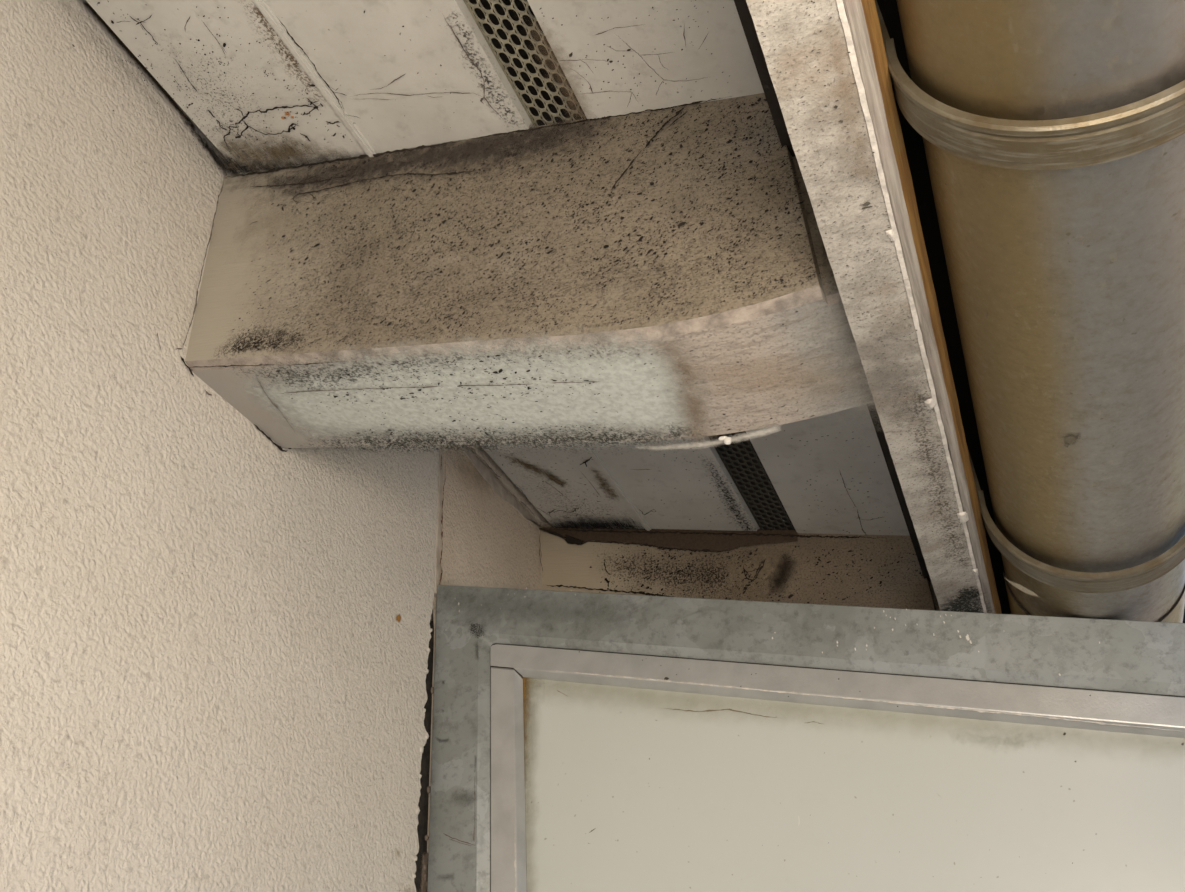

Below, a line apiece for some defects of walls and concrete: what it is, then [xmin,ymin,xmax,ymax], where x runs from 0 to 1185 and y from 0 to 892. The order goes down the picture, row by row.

damp [937,581,990,613]